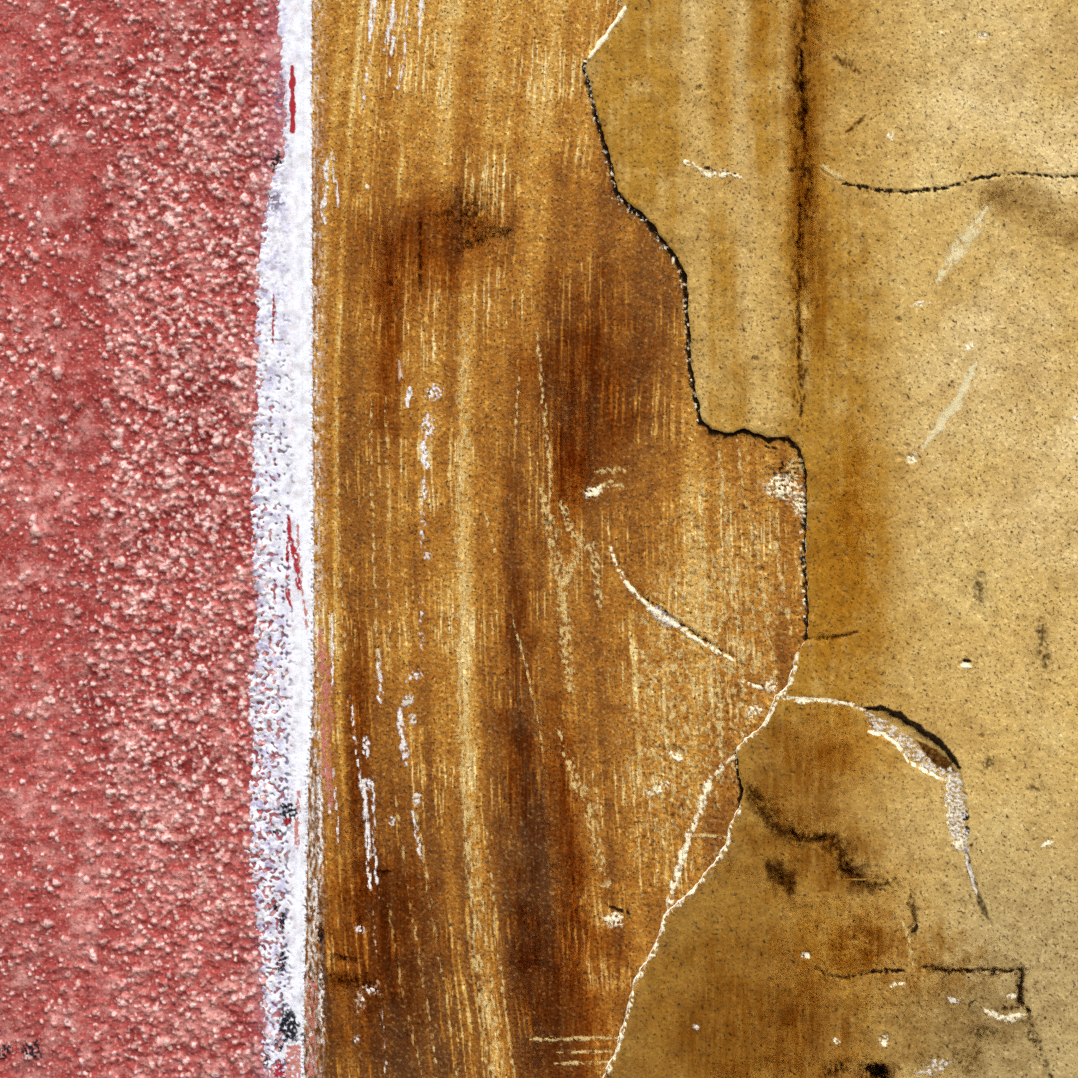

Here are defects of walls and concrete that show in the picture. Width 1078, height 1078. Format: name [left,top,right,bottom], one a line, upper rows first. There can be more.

crack [822,164,1078,194]
damp [446,198,509,247]
spalling [585,467,626,499]
spalling [763,458,806,514]
crack [582,3,866,1074]
spalling [626,439,792,850]
spalling [863,705,987,917]
spalling [604,905,630,928]
crack [822,895,1036,1042]